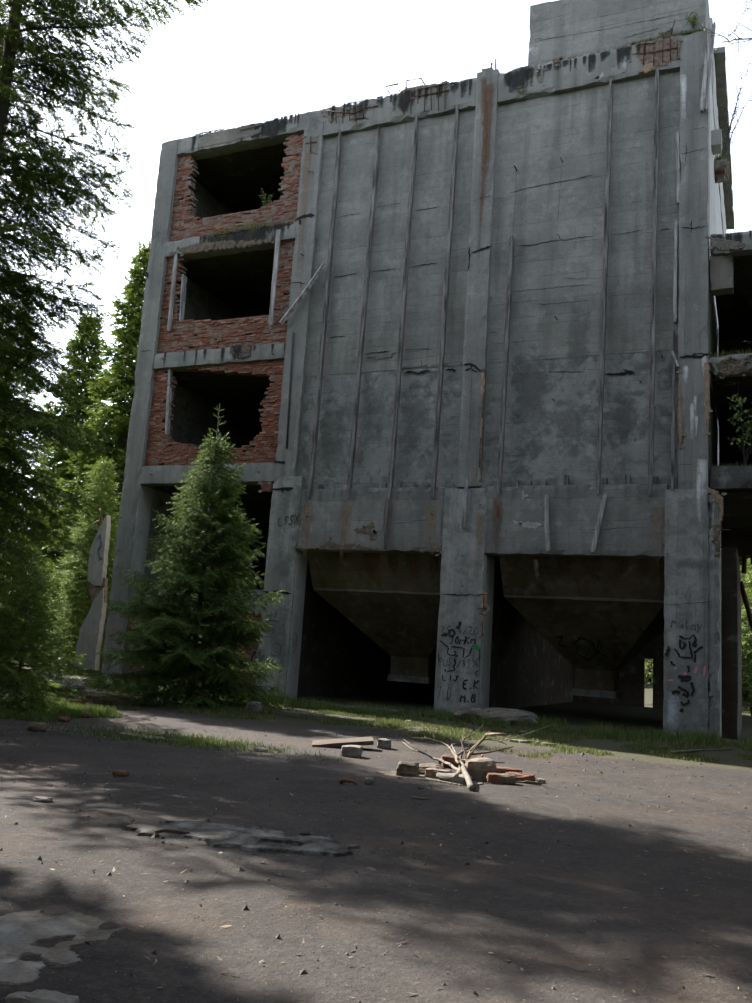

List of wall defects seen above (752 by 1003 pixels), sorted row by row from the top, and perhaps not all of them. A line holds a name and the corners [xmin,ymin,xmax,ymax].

damp [504,44,646,92]
corrosion [480,78,491,221]
spalling [703,355,752,435]